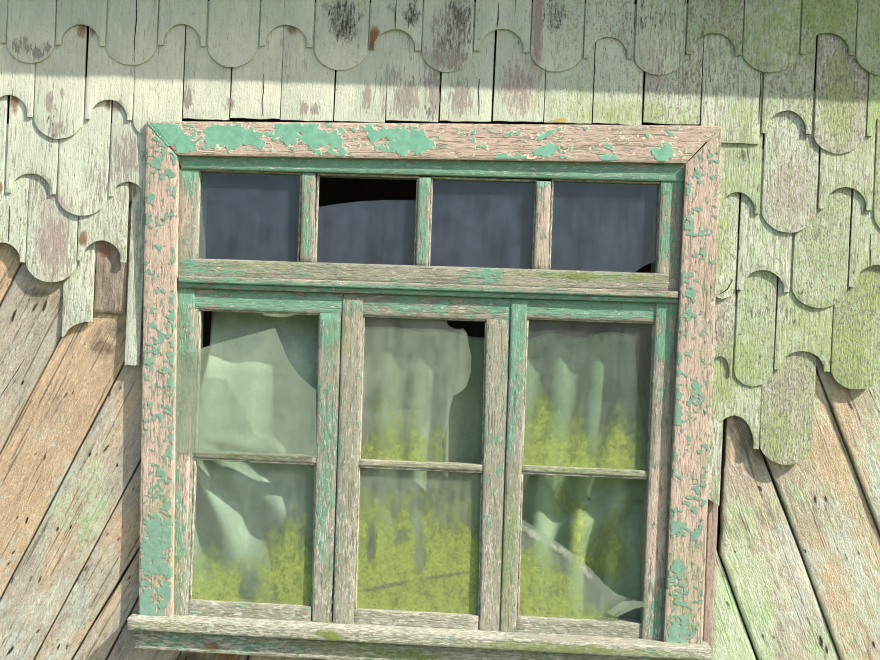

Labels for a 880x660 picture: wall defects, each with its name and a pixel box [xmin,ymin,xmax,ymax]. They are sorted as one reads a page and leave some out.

peeling [115,0,573,229]
peeling [588,126,720,237]
peeling [679,247,716,343]
peeling [139,261,176,617]
peeling [665,351,713,644]